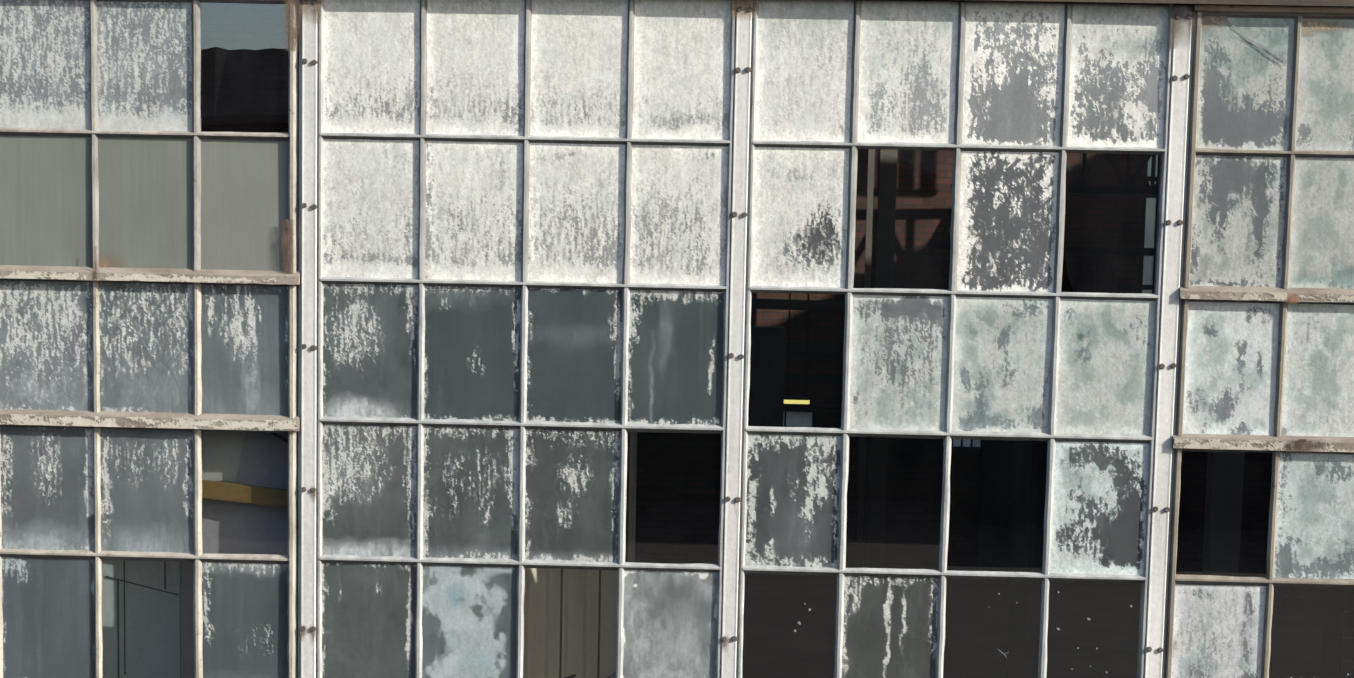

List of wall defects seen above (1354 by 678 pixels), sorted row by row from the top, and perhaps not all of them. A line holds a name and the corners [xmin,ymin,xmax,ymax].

rust [285,0,321,51]
peeling [0,270,298,604]
peeling [1171,17,1354,678]